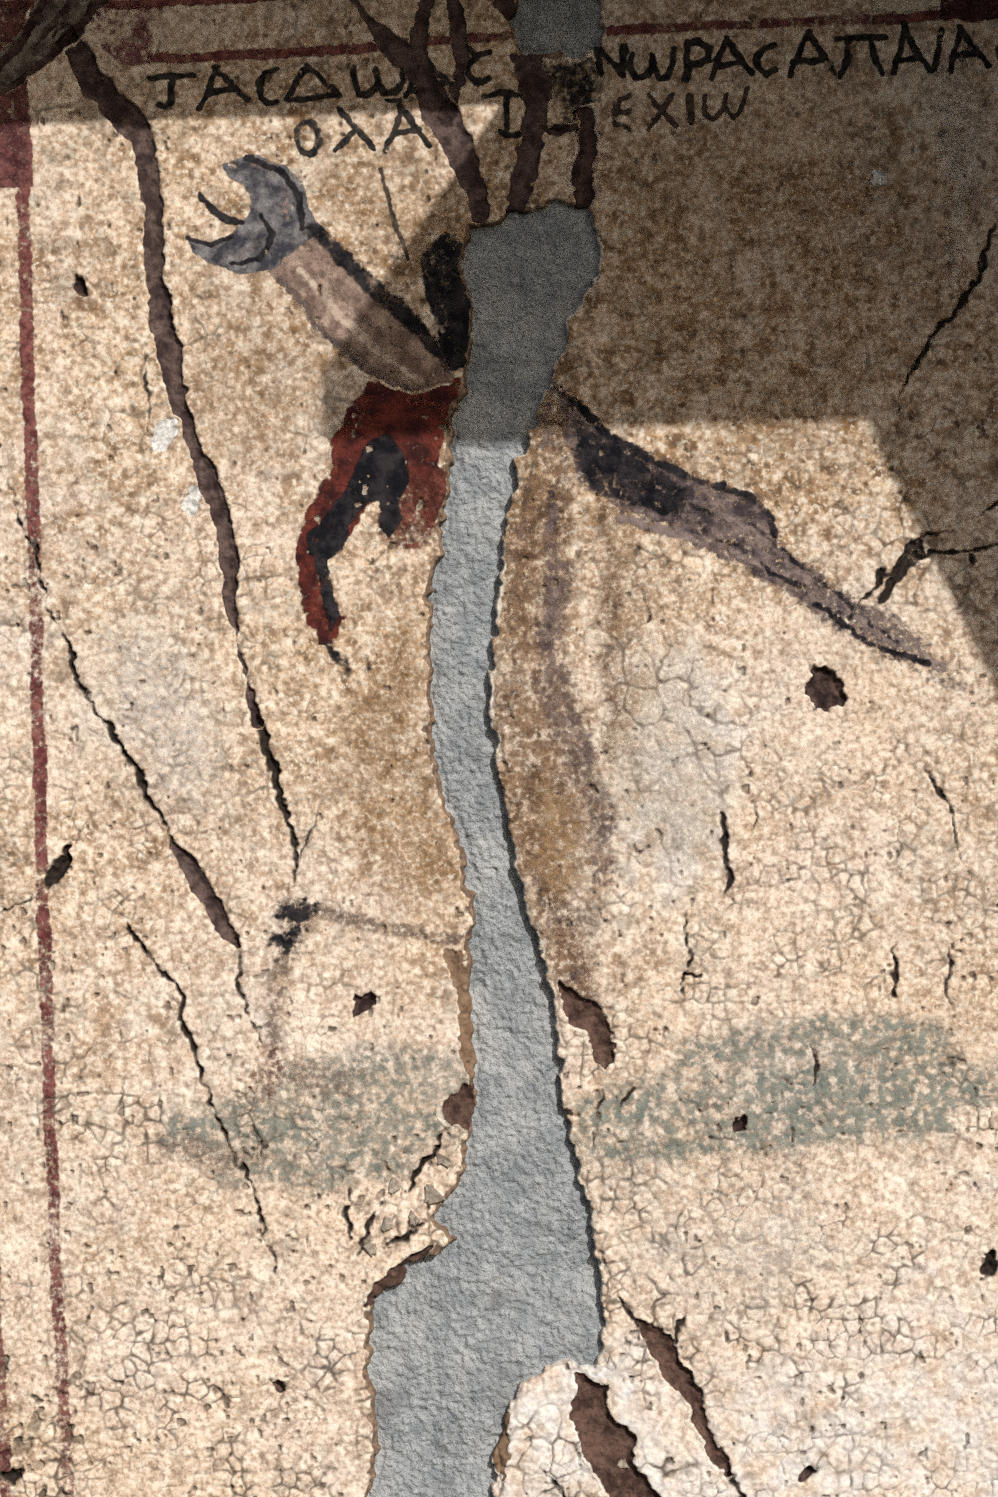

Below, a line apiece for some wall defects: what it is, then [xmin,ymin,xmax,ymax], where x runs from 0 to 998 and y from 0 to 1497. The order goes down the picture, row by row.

crack [0,0,317,882]
crack [847,501,998,621]
crack [897,226,996,413]
crack [8,485,261,1042]
crack [349,0,746,1497]
crack [121,904,277,1273]
spalling [342,948,477,1311]
spalling [558,981,622,1075]
spalling [493,1410,512,1481]
spalling [569,1371,660,1497]